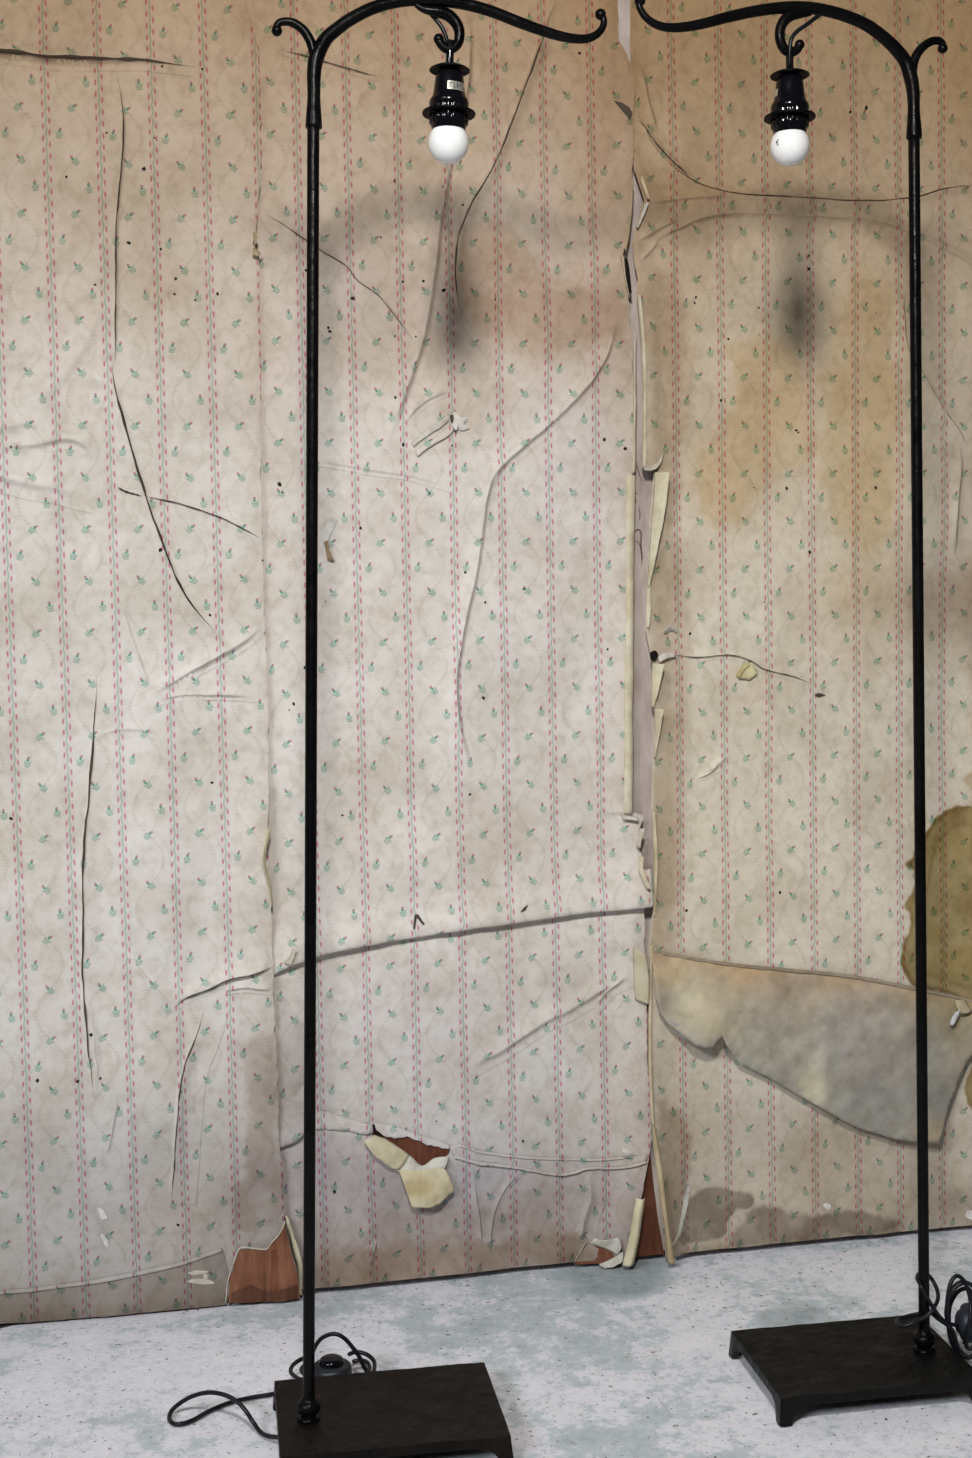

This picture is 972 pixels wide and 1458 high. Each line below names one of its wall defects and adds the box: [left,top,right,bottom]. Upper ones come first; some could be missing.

peeling [614,100,632,120]
peeling [621,177,677,916]
water stain [899,556,972,690]
water stain [900,764,972,1000]
water stain [963,1066,972,1110]
spalling [364,1124,455,1208]
peeling [421,946,972,1407]
peeling [187,1215,303,1303]